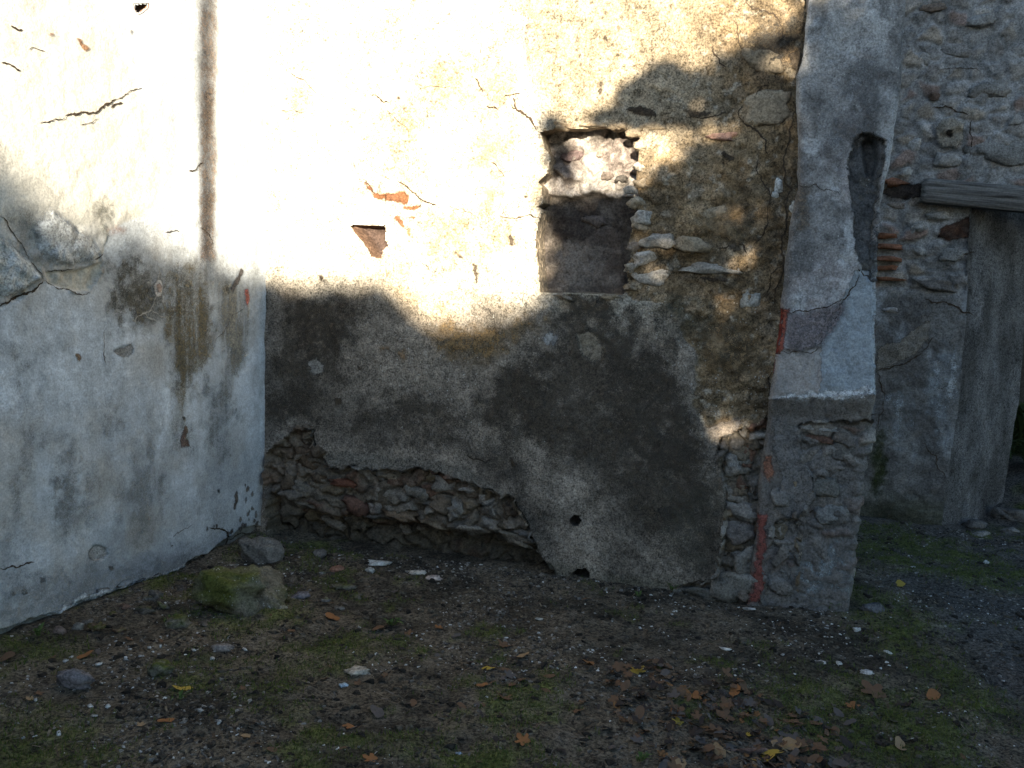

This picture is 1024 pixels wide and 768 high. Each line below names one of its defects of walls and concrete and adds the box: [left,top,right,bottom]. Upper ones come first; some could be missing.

crack [41,88,141,125]
water stain [109,0,250,411]
spalling [364,182,419,236]
flaking render [553,121,743,300]
crack [692,85,869,354]
peeling [768,133,906,400]
spalling [207,424,555,572]